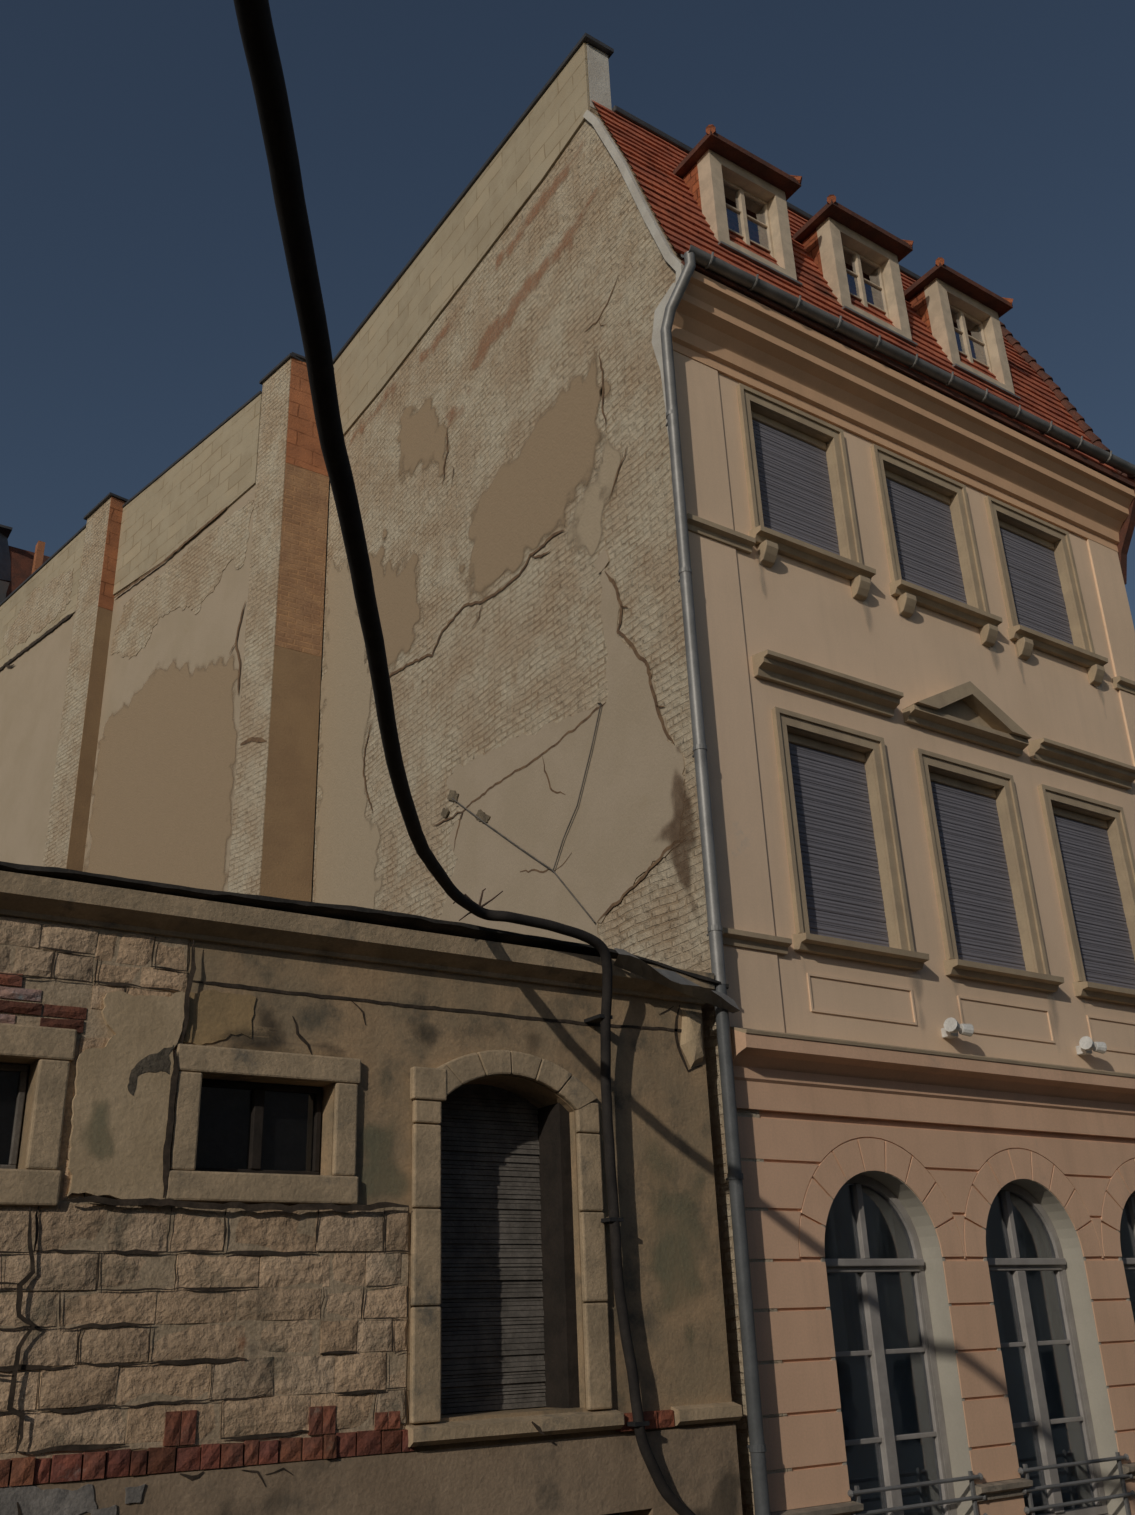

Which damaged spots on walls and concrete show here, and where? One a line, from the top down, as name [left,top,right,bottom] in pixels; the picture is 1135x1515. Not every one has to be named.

crack [586,276,627,498]
crack [389,530,564,676]
crack [605,571,674,744]
crack [363,725,373,813]
crack [432,702,606,847]
crack [520,854,571,873]
crack [597,844,673,922]
peeling [0,972,185,1199]
crack [0,940,702,1454]
peeling [0,1484,145,1515]
crack [180,1471,204,1481]
crack [242,1467,293,1487]